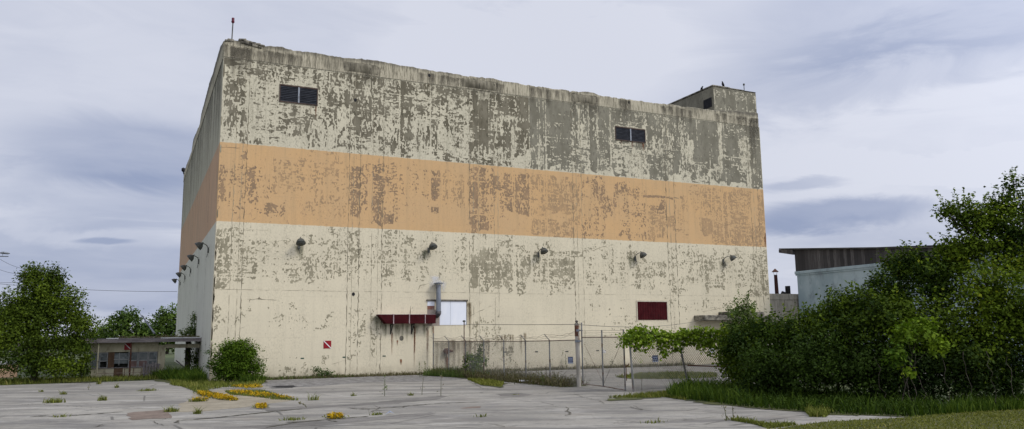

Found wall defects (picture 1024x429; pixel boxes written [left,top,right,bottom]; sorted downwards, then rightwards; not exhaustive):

peeling [210,58,769,360]